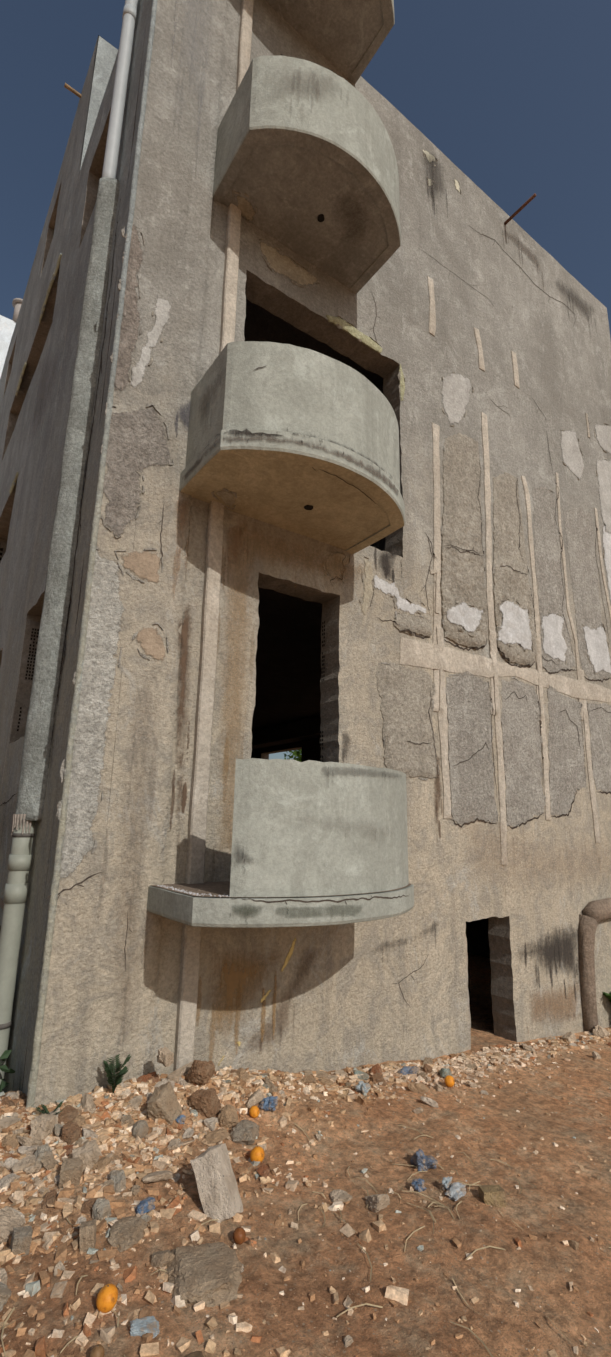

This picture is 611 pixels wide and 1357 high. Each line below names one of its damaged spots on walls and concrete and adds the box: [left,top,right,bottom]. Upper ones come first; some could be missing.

crack [1,191,122,805]
spalling [55,225,174,878]
peeling [359,556,567,664]
leakage [525,930,576,998]